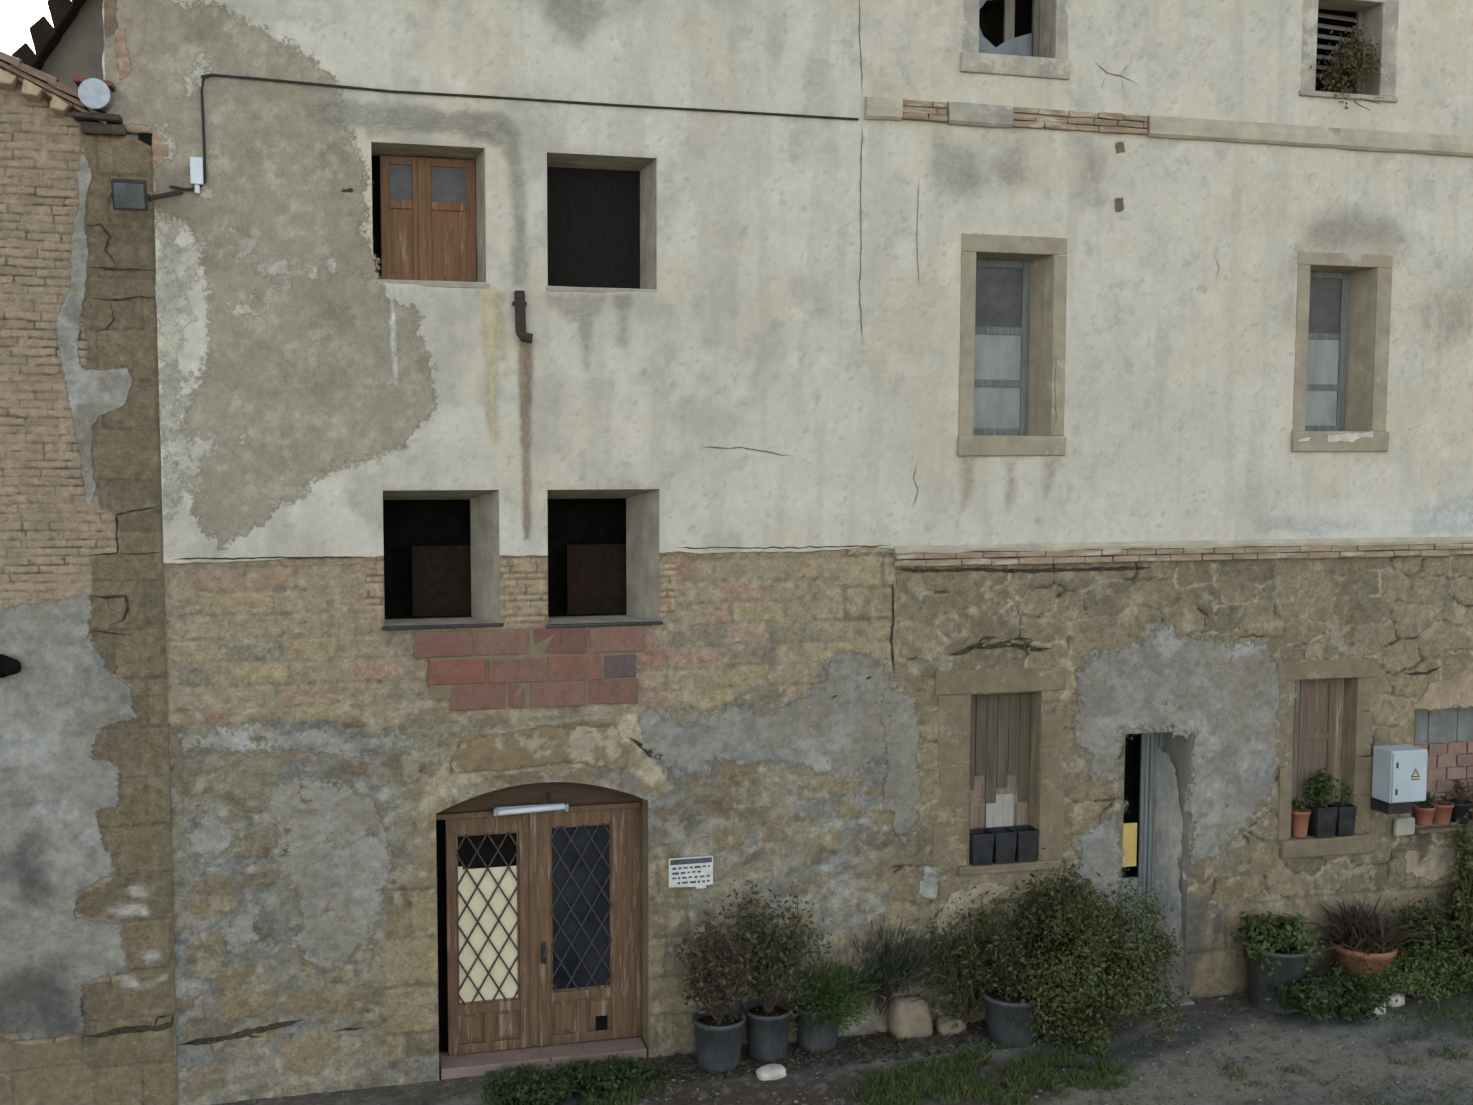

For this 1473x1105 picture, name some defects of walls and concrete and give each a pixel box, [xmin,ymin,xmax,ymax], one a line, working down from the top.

crack [857,0,865,84]
peeling [103,0,439,551]
crack [857,132,865,340]
crack [704,447,794,457]